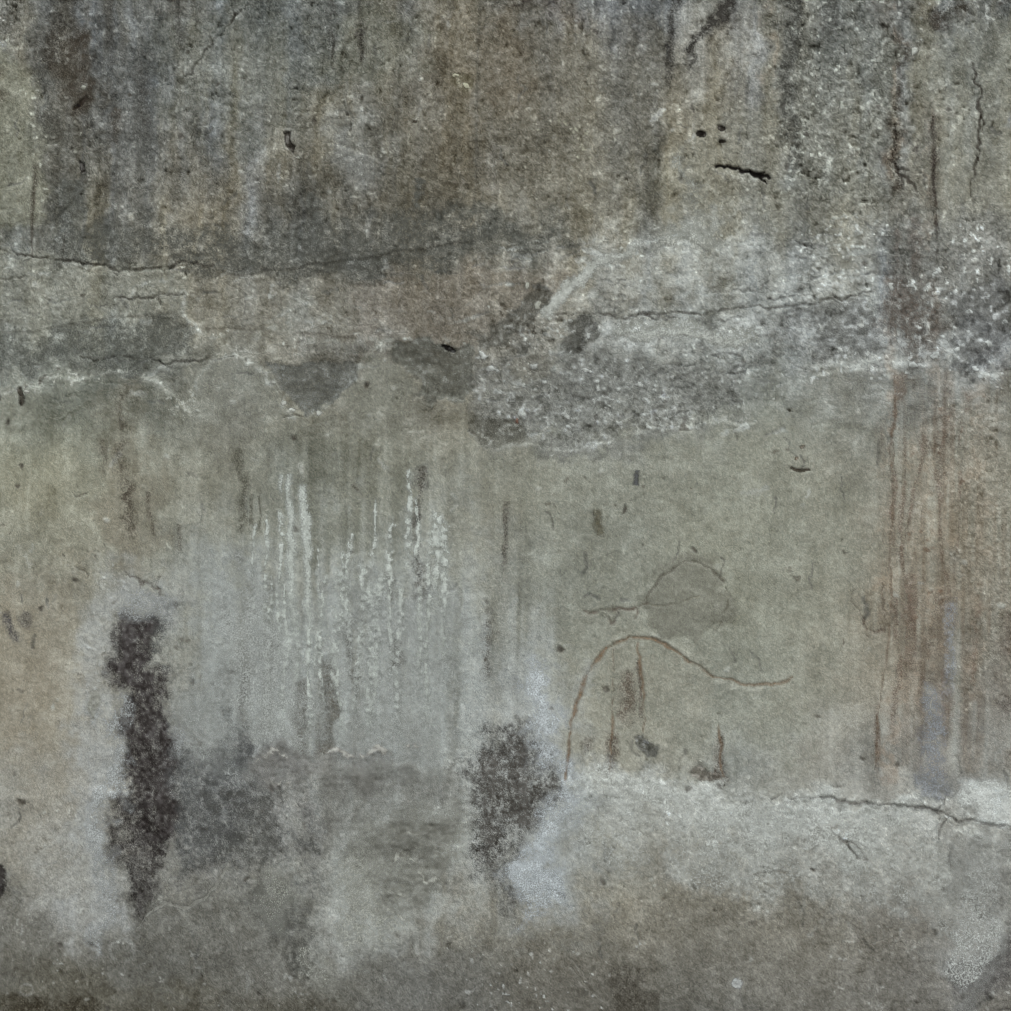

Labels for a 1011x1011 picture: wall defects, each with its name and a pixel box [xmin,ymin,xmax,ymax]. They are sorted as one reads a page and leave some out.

crack [715,165,771,184]
damp [81,450,468,987]
crack [565,637,792,779]
damp [334,657,1011,1011]
crack [810,797,871,805]
crack [897,805,1003,827]